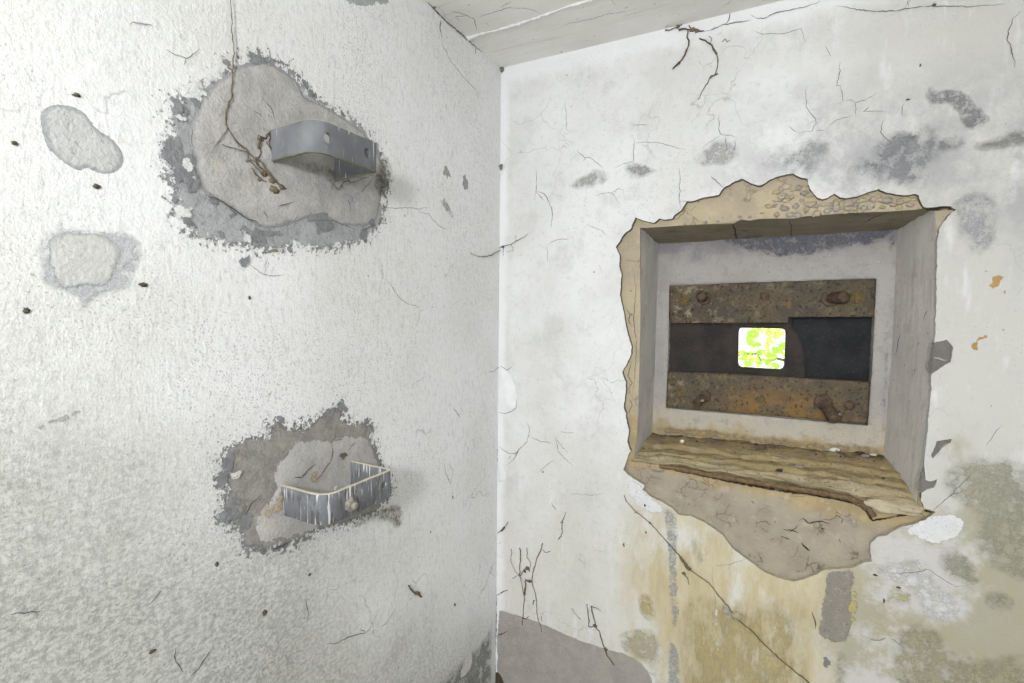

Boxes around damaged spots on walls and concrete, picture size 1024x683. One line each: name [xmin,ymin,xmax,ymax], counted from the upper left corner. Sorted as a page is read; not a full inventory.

crack [707,1,1020,144]
peeling [156,47,394,267]
spalling [617,175,953,642]
peeling [208,394,397,563]
water stain [666,512,677,624]
water stain [946,556,977,581]
water stain [954,463,1024,577]
water stain [625,631,656,660]
water stain [669,644,678,683]
water stain [692,610,792,683]
water stain [896,630,1024,683]